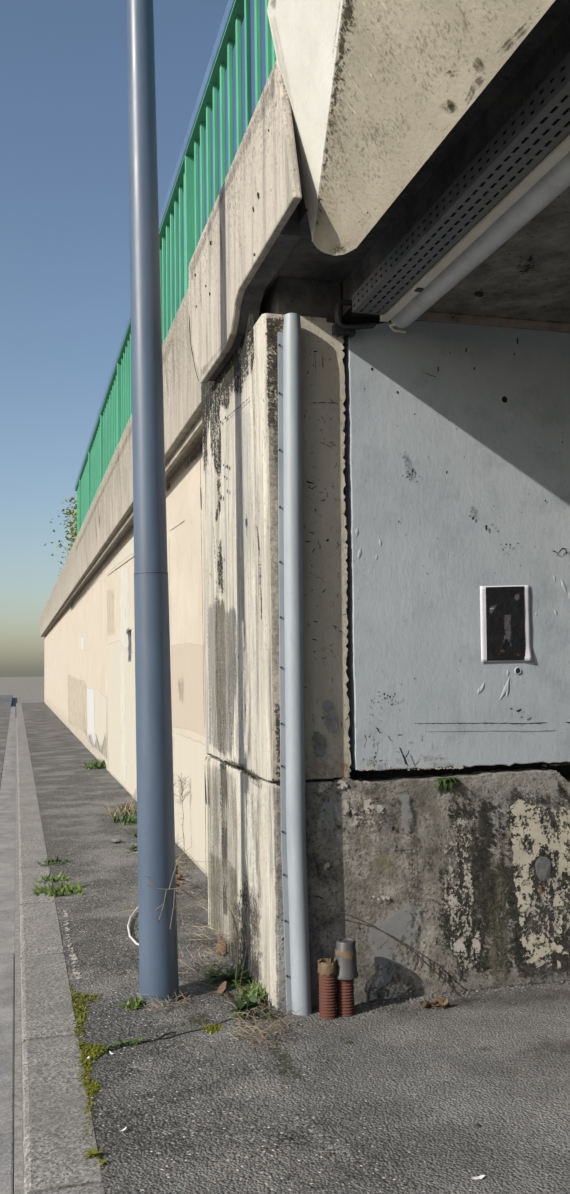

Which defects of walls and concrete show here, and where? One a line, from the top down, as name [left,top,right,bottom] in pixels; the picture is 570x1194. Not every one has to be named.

water stain [185,313,284,600]
water stain [245,519,279,663]
water stain [433,786,570,1003]
peeling [510,780,570,973]